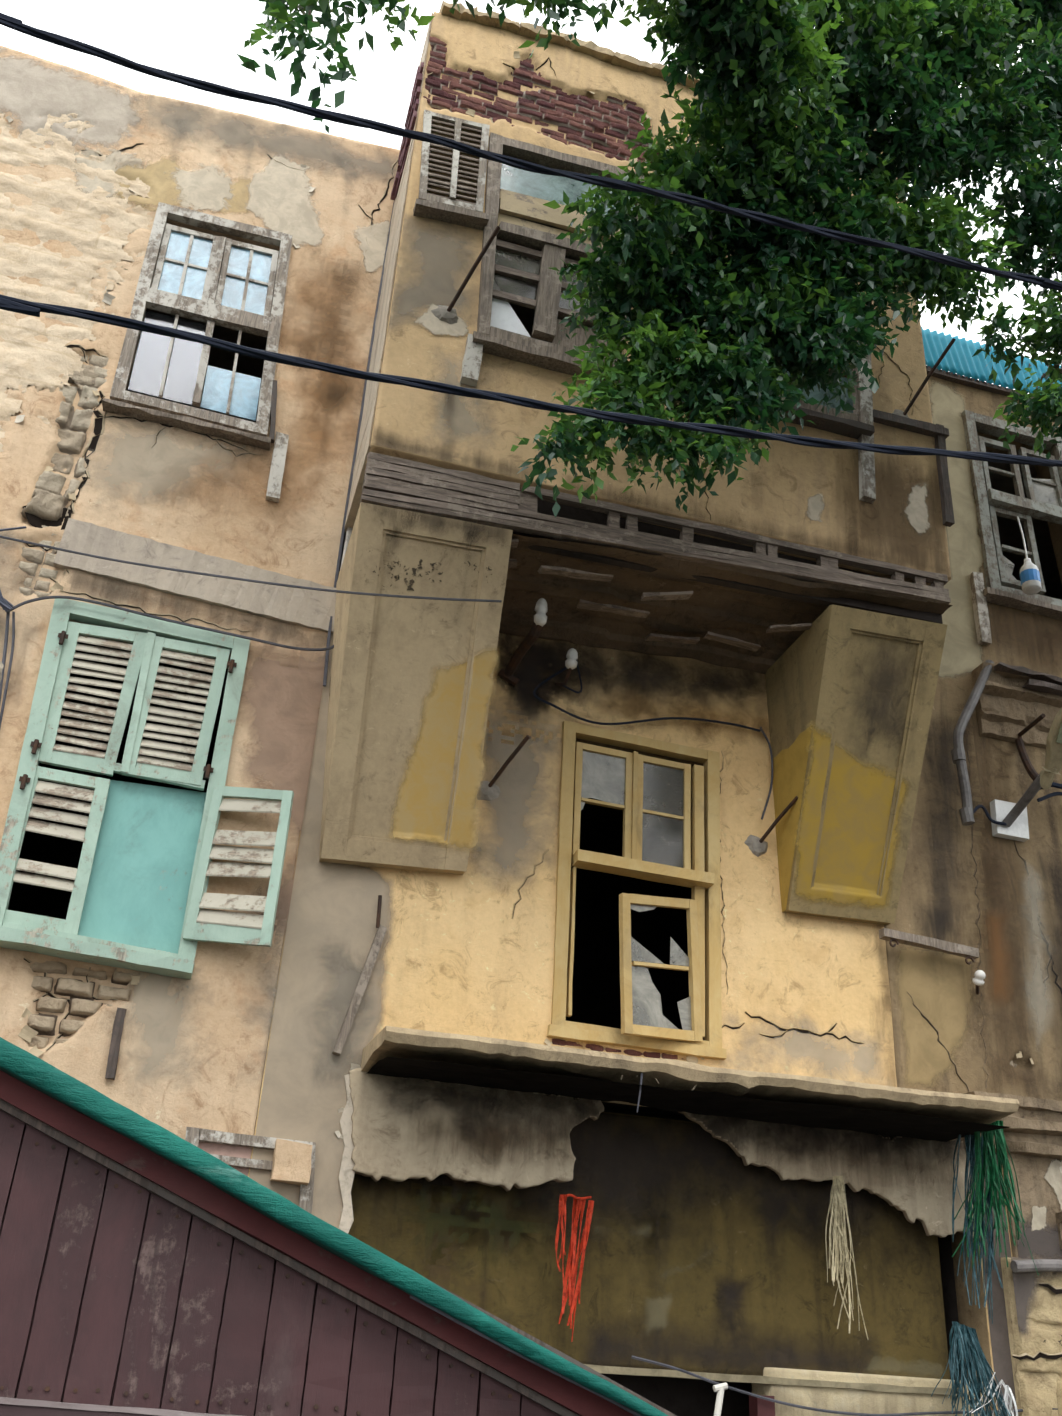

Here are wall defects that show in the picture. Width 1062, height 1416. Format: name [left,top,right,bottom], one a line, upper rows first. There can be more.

spalling [423,36,659,163]
peeling [0,113,352,597]
peeling [904,382,985,677]
peeling [393,650,549,874]
spalling [18,961,140,1057]
crack [512,849,549,919]
crack [720,839,864,1044]
crack [907,700,989,1092]
crack [1013,840,1062,995]
peeling [1031,1159,1062,1232]
crack [1012,1351,1062,1360]
crack [1038,1282,1062,1294]